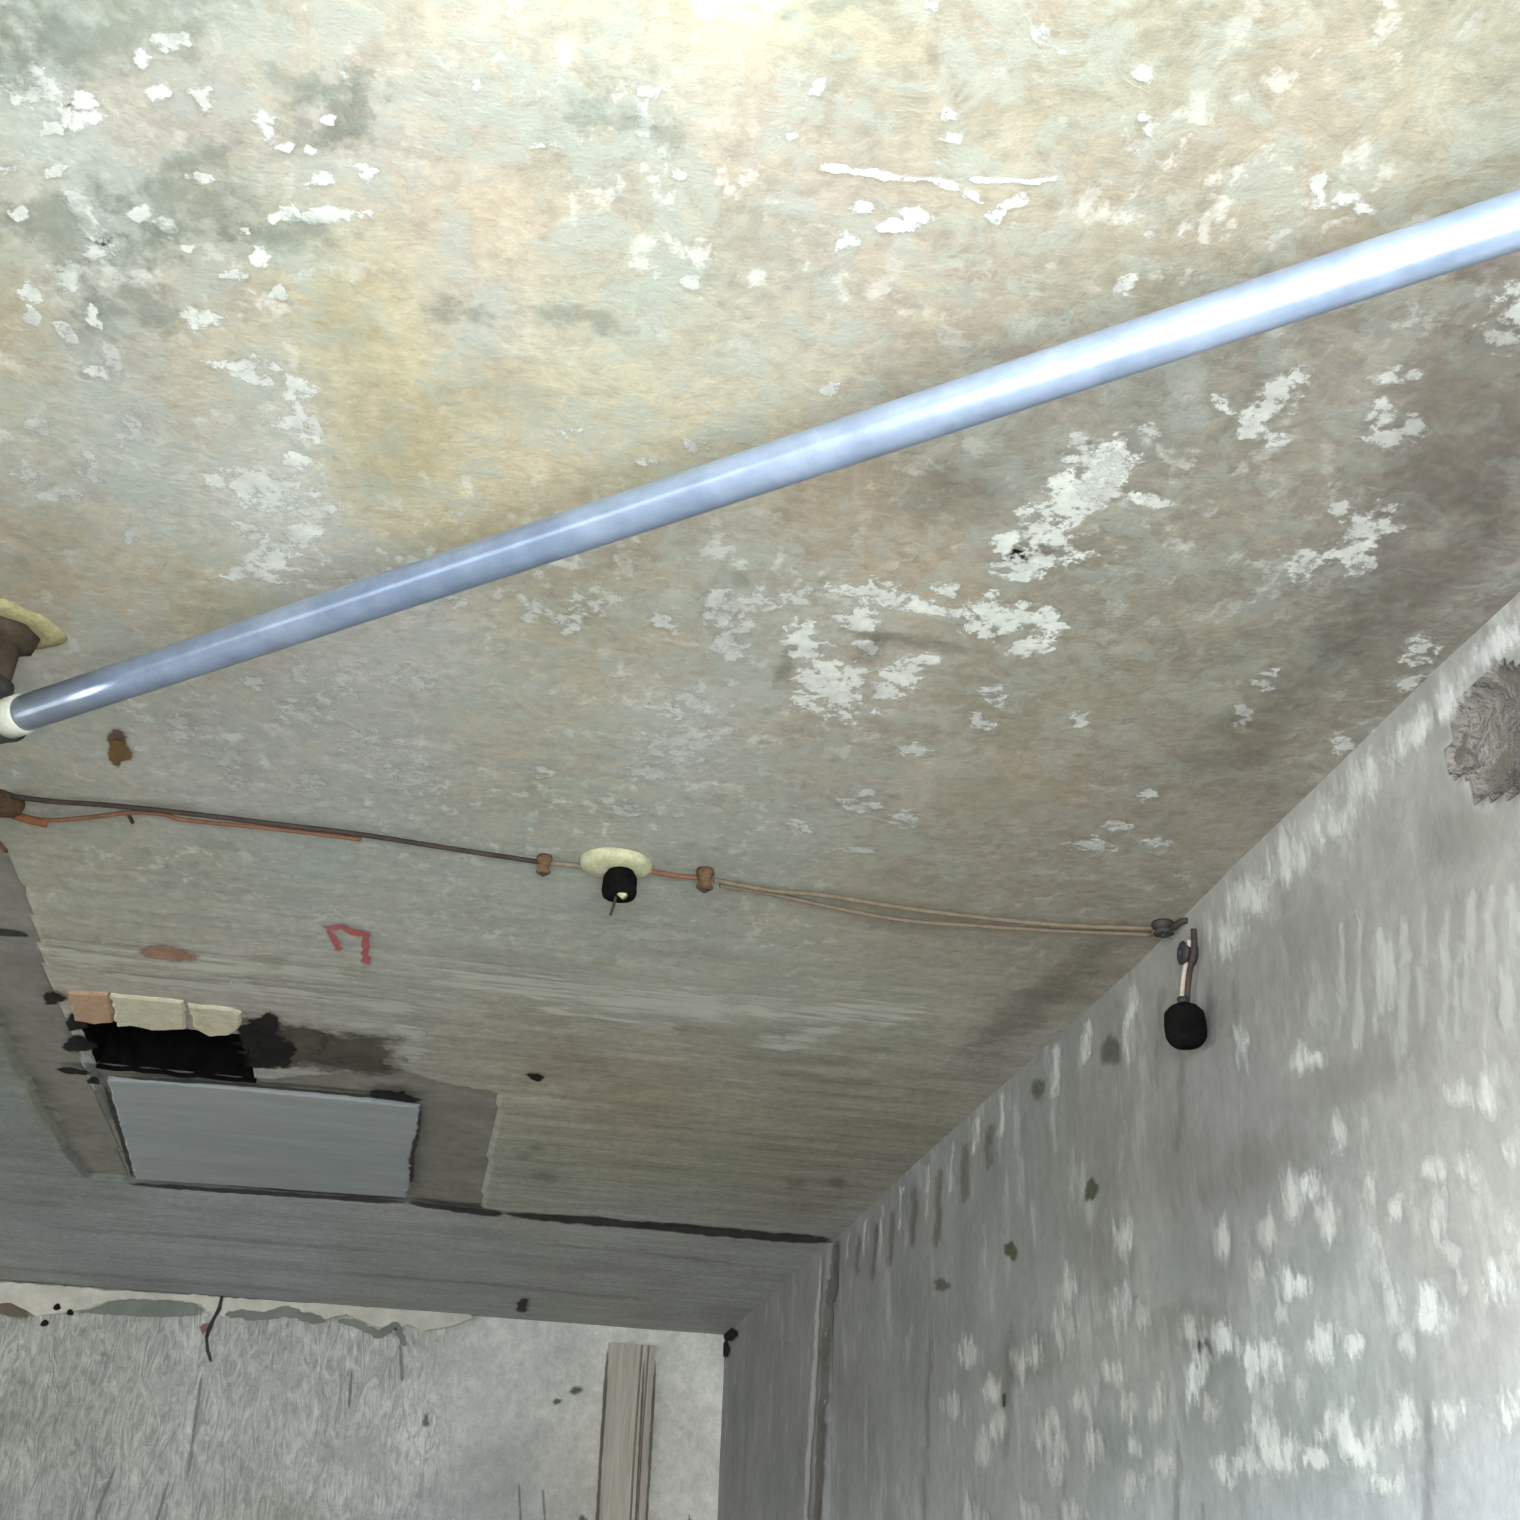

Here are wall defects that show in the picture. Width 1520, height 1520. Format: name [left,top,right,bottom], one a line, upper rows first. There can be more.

peeling [252,106,373,228]
peeling [16,163,131,382]
peeling [702,422,1179,731]
peeling [1284,499,1406,584]
rust [107,729,132,767]
spalling [1396,627,1520,805]
spalling [0,848,498,1208]
damp [1032,1081,1044,1098]
damp [1101,1037,1119,1063]
damp [855,1189,916,1280]
damp [933,1171,941,1247]
damp [961,1127,993,1202]